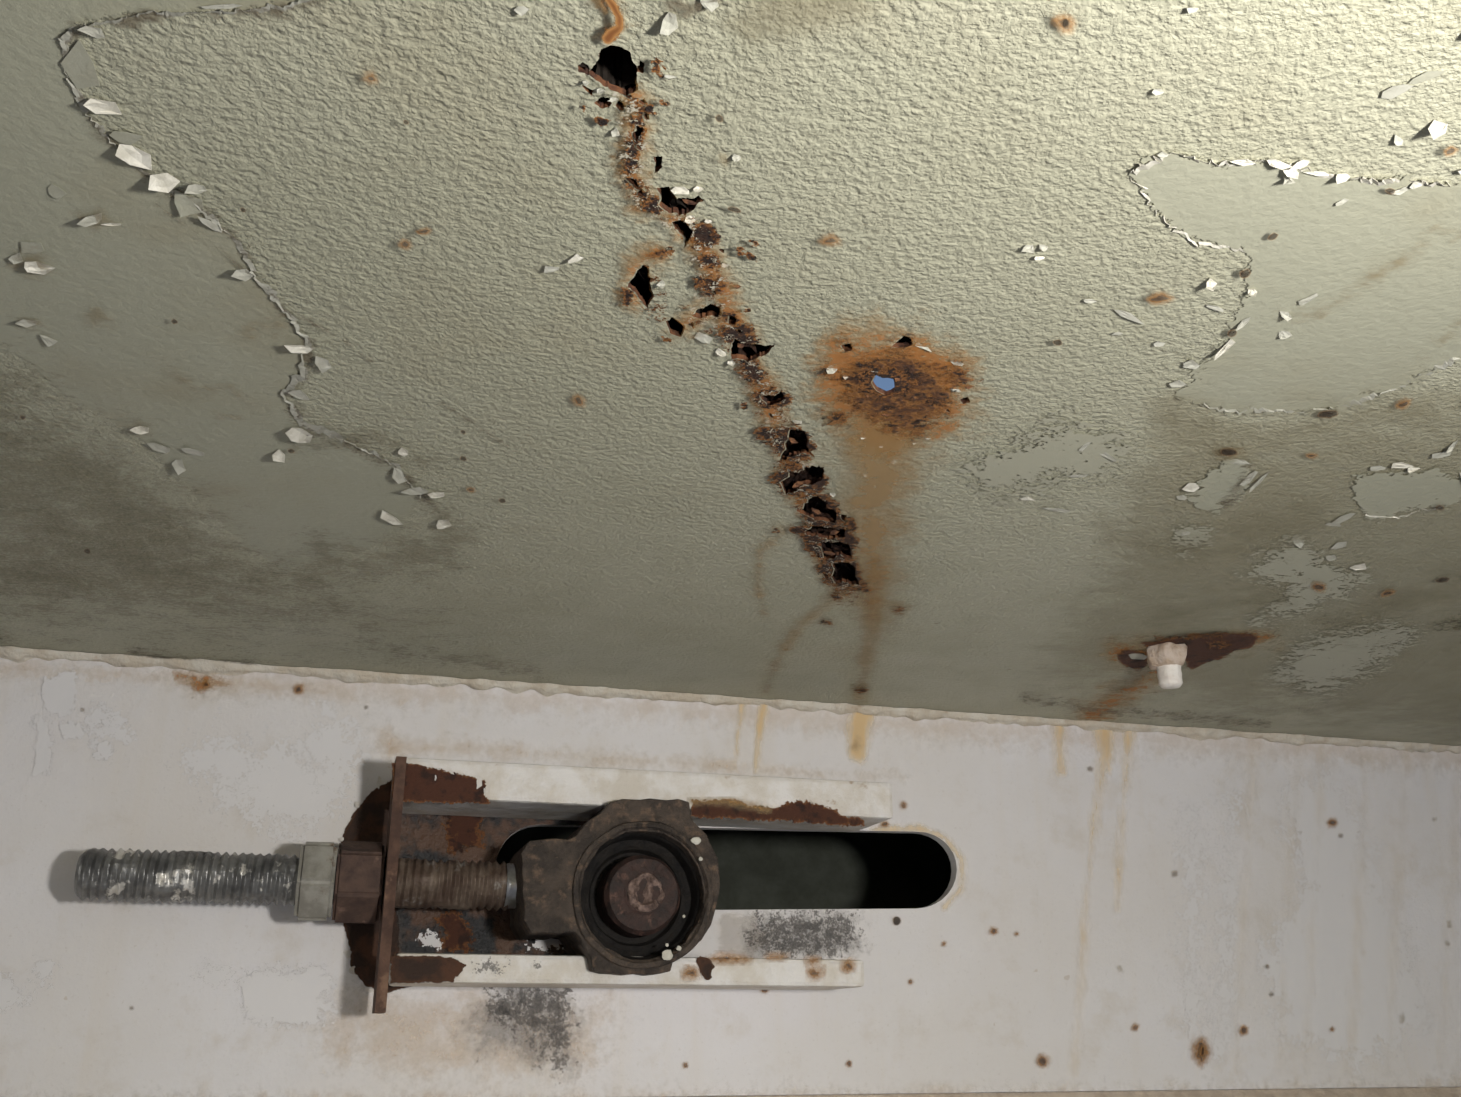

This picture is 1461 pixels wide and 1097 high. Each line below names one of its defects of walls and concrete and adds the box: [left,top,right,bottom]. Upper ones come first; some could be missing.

peeling [660,0,719,35]
peeling [1428,120,1448,140]
peeling [0,0,444,574]
peeling [544,254,583,273]
peeling [1129,150,1461,418]
peeling [436,519,451,529]
rust [804,327,984,616]
peeling [1164,456,1270,562]
peeling [1232,441,1461,712]
rust [1079,631,1274,770]
rust [1193,1039,1210,1064]